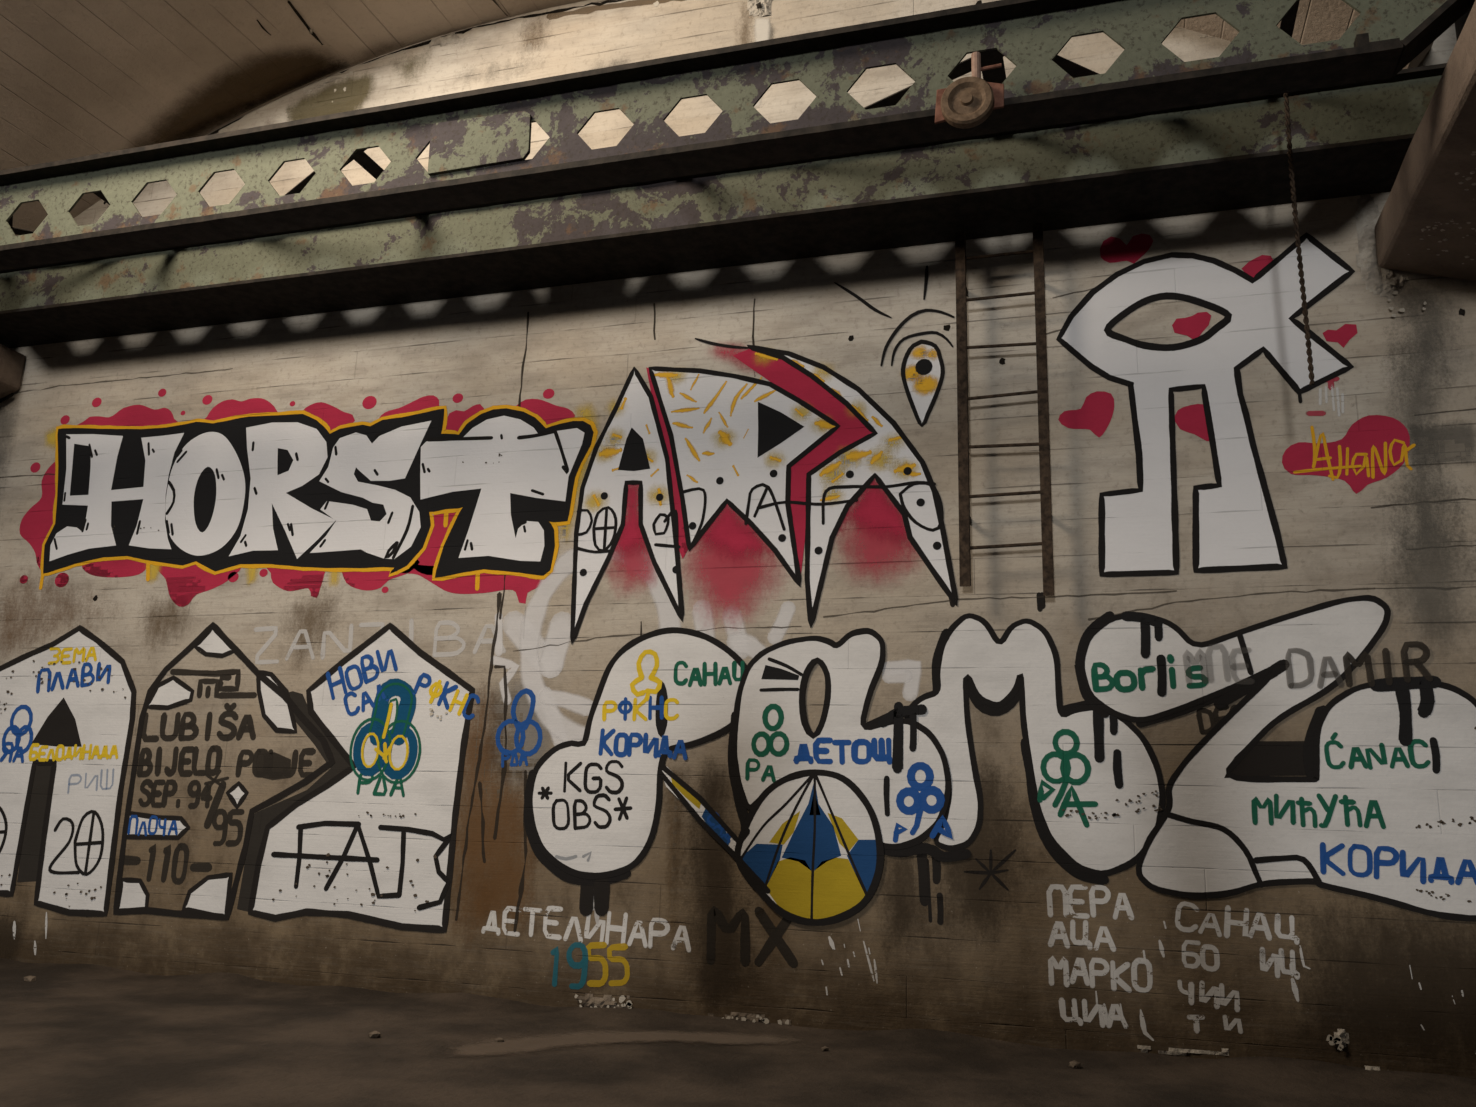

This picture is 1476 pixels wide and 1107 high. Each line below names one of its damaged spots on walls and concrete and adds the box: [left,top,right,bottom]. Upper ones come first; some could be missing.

spalling [429,33,462,49]
spalling [747,0,771,42]
spalling [303,71,353,102]
water stain [288,76,371,121]
spalling [1355,194,1427,317]